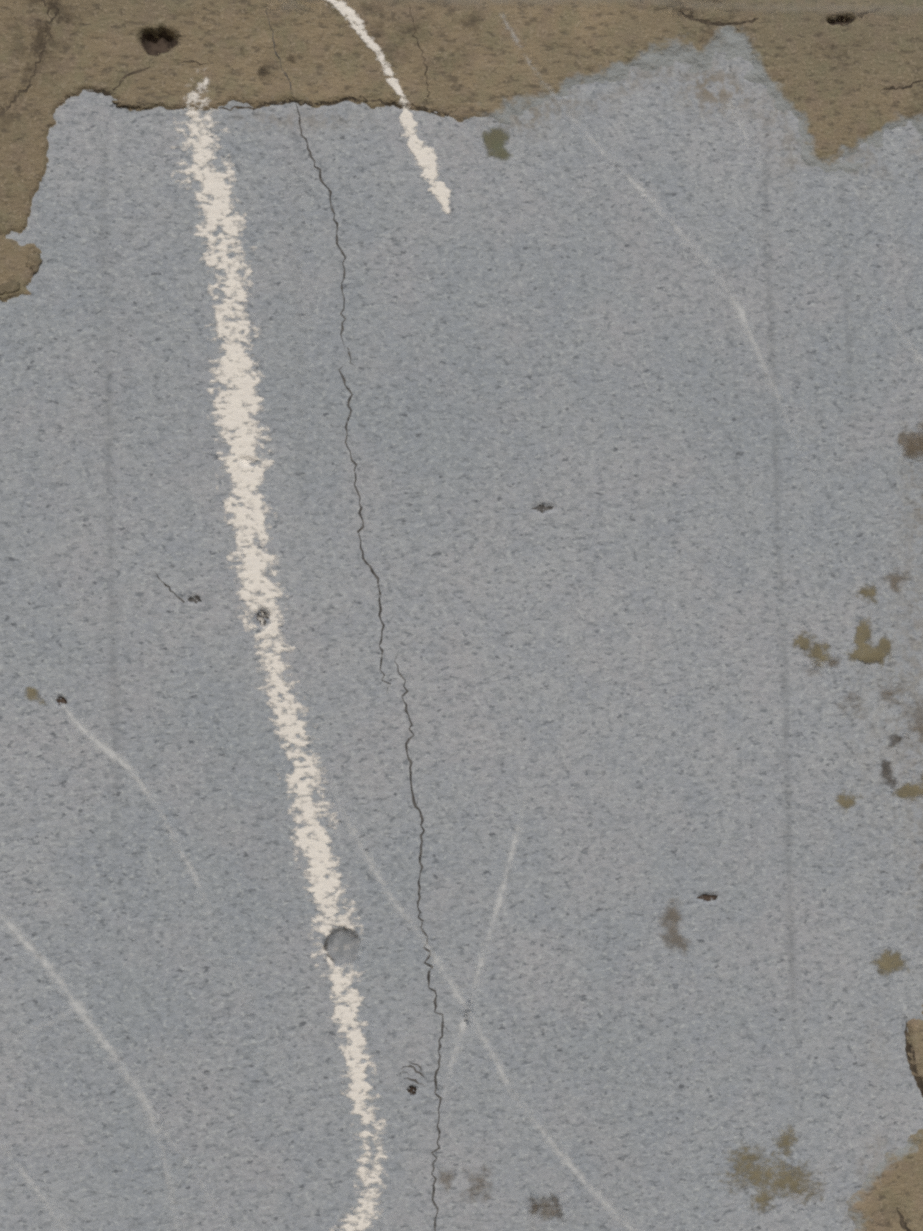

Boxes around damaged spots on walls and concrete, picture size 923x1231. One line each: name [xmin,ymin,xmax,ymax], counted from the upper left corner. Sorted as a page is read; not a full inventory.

crack [220,4,458,1231]
crack [904,1021,923,1097]
crack [897,1209,911,1231]